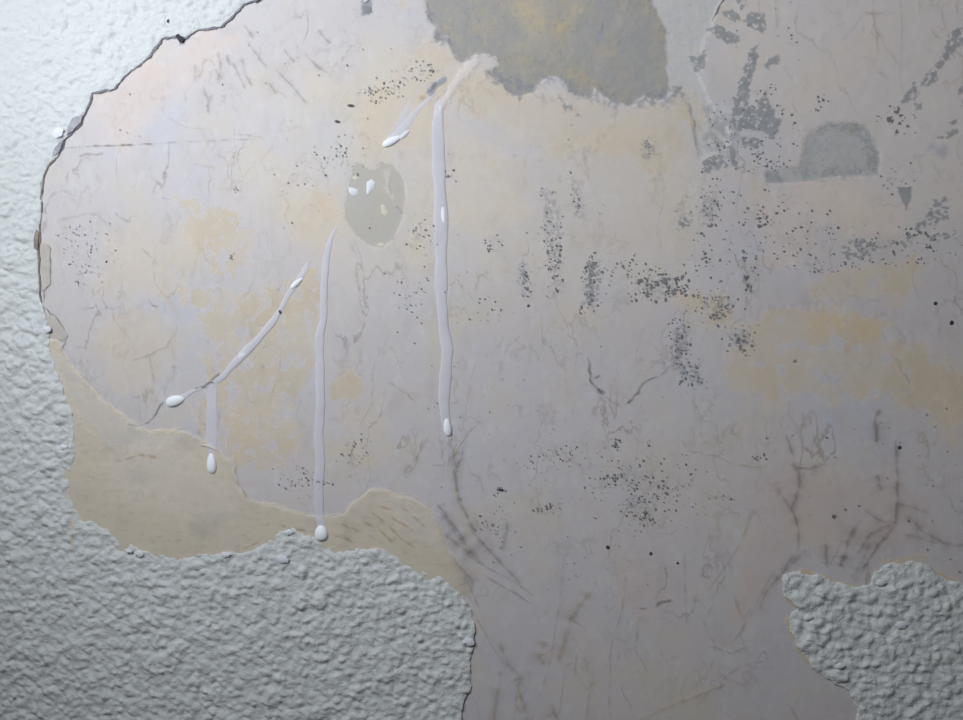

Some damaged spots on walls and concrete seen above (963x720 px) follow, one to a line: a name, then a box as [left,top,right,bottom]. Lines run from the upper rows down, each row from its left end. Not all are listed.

peeling [199,0,256,30]
peeling [52,121,82,157]
peeling [83,69,132,117]
damp [358,60,435,138]
spalling [426,0,728,157]
peeling [33,224,42,303]
spalling [344,163,405,247]
damp [540,187,565,299]
damp [579,184,818,388]
peeling [49,340,317,561]
damp [580,438,707,536]
peeling [318,488,469,595]